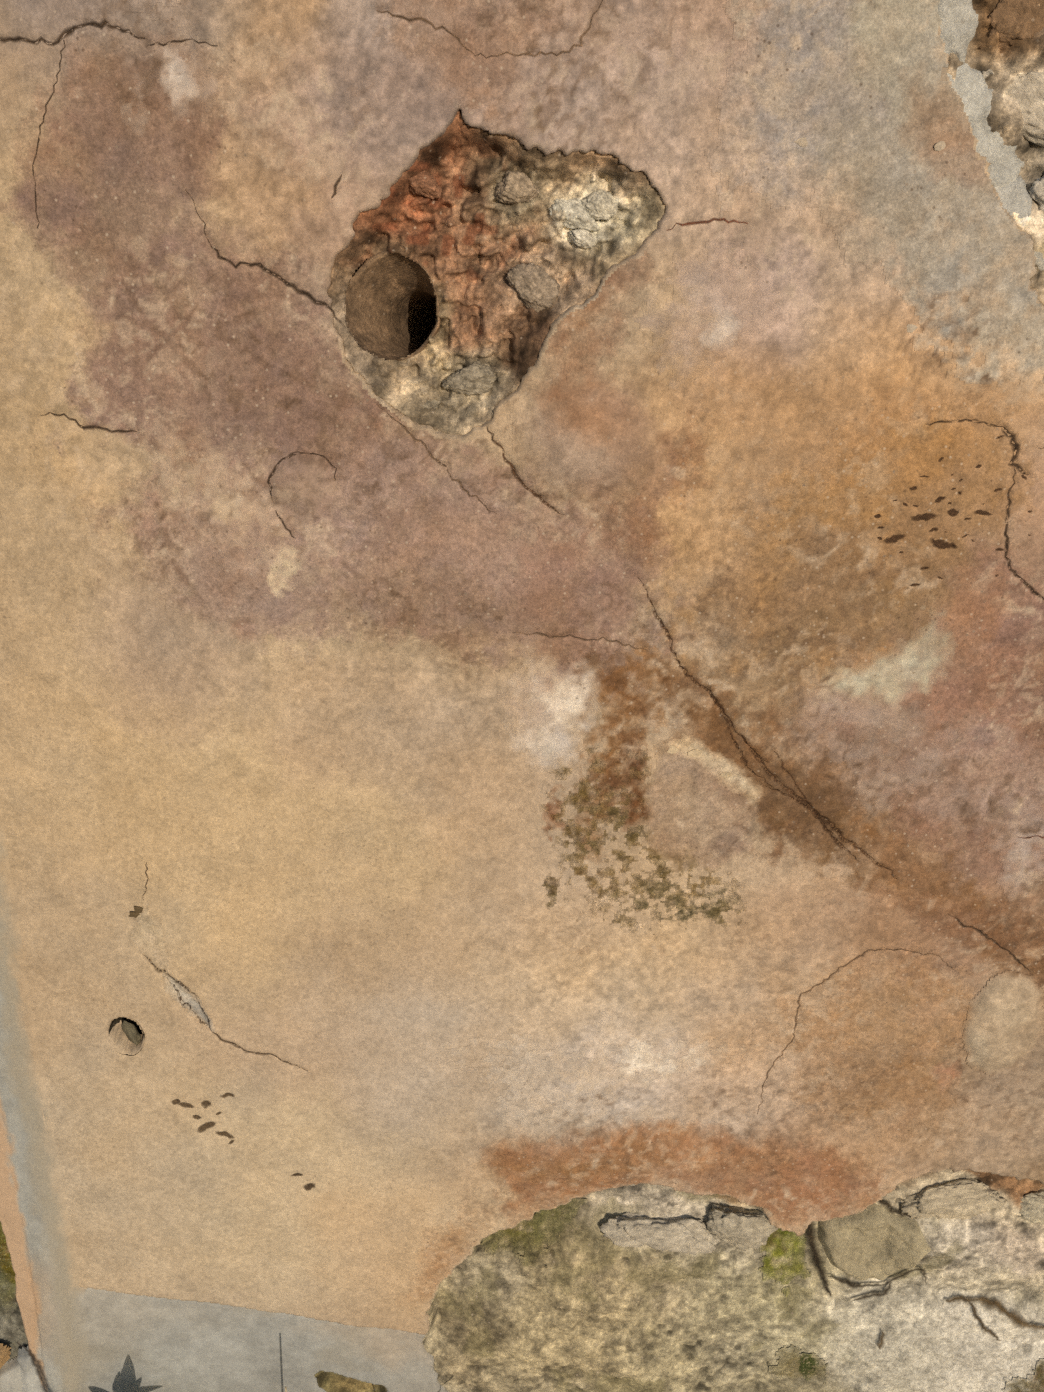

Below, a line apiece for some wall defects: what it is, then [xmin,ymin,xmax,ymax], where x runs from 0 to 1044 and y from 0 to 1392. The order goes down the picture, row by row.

crack [0,20,218,228]
crack [187,192,346,328]
flaking render [327,110,665,435]
peeling [704,0,1044,390]
spalling [893,474,1002,549]
crack [927,419,1044,599]
crack [515,582,897,879]
leakage [542,873,560,910]
leakage [589,870,754,929]
rust [393,941,986,1312]
flaking render [315,1371,387,1392]
flaking render [423,1168,1044,1392]